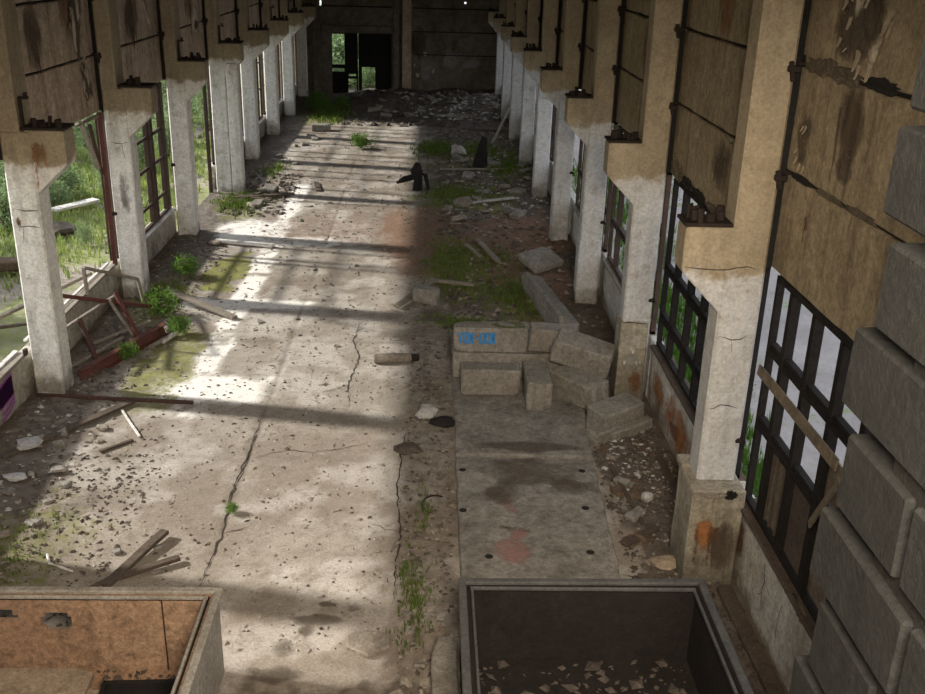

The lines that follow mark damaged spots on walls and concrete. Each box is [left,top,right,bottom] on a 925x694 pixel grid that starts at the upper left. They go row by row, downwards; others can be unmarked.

leakage [23,9,41,74]
peeling [802,0,902,97]
spalling [672,154,717,215]
crack [323,326,373,398]
rust [652,374,687,454]
crack [200,418,361,585]
rust [693,521,718,564]